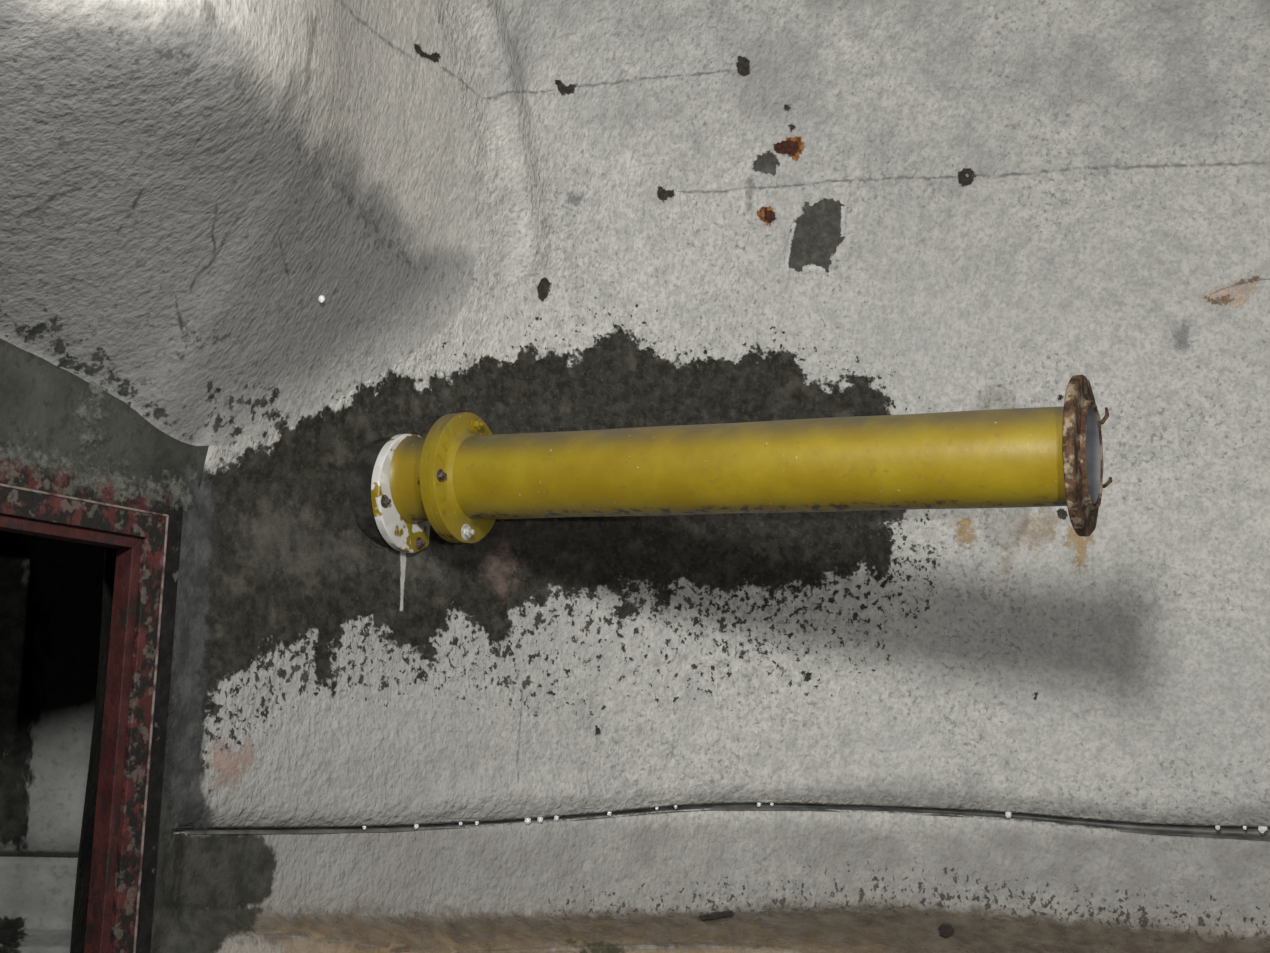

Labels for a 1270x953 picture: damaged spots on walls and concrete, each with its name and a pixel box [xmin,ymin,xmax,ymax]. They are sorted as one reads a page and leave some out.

rust [773,136,805,161]
crack [1092,163,1186,171]
rust [757,206,776,226]
peeling [785,198,849,275]
peeling [1202,276,1266,307]
rust [957,519,974,542]
rust [1066,528,1094,567]
water stain [0,297,1270,953]